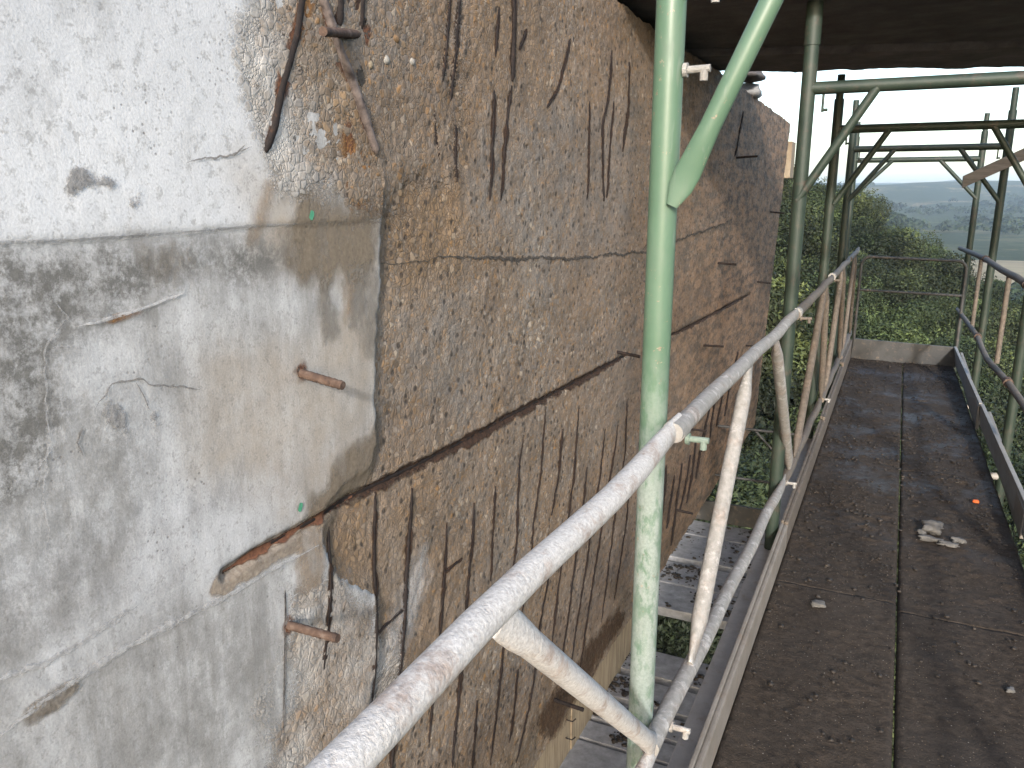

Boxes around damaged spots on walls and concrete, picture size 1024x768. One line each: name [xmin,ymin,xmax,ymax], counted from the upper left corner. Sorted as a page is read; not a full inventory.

crack [187,145,248,163]
rust [343,123,372,169]
spalling [679,51,723,160]
water stain [286,190,383,349]
crack [381,244,647,265]
crack [676,221,728,242]
spalling [667,88,790,422]
crack [76,378,199,455]
rust [223,495,352,572]
water stain [297,419,379,589]
spalling [210,0,655,768]
spalling [660,355,763,572]